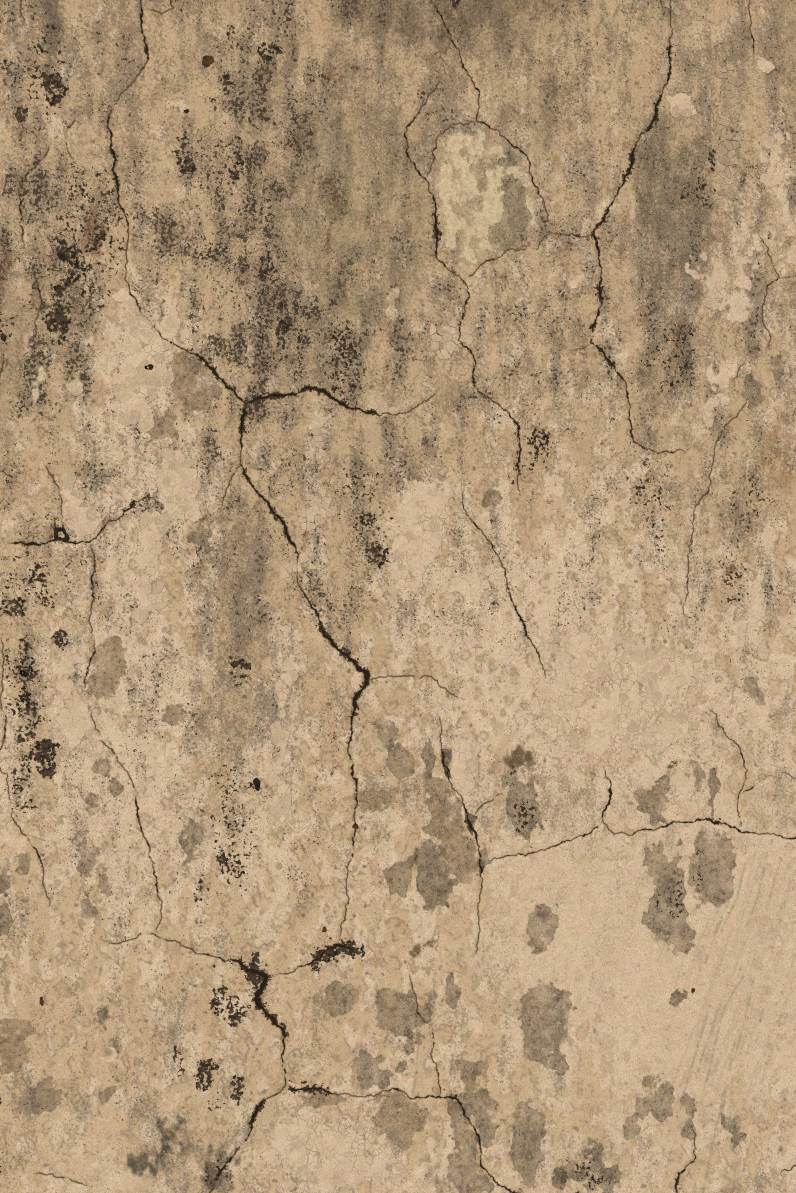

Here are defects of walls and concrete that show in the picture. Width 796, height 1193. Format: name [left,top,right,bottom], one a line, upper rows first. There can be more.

damp [0,0,70,123]
peeling [666,93,697,118]
peeling [757,57,775,73]
damp [41,166,128,346]
crack [404,0,682,490]
peeling [684,122,796,323]
damp [0,556,68,817]
peeling [110,288,221,632]
crack [0,0,519,1193]
damp [338,460,400,569]
crack [462,492,545,674]
crack [439,710,796,954]